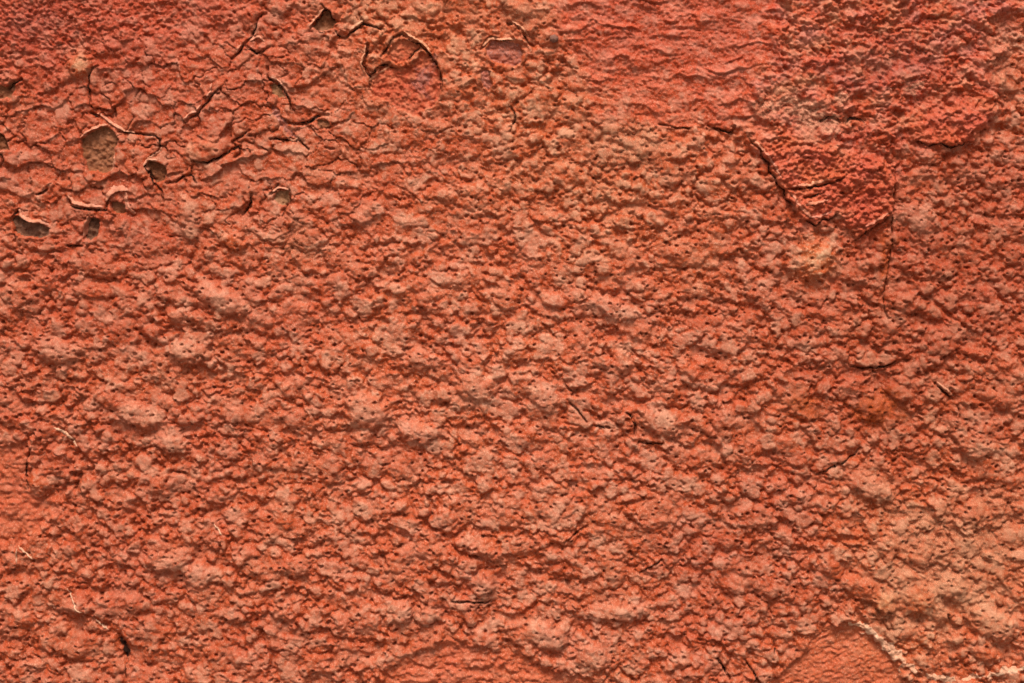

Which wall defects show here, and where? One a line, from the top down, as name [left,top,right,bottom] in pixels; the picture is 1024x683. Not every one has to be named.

crack [312,9,443,87]
crack [87,14,330,198]
peeling [13,209,49,238]
crack [38,190,108,247]
peeling [83,216,100,240]
peeling [80,124,119,173]
peeling [105,185,136,214]
peeling [143,158,167,182]
peeling [273,186,290,205]
crack [714,125,844,226]
crack [860,169,897,323]
spalling [772,621,1024,683]